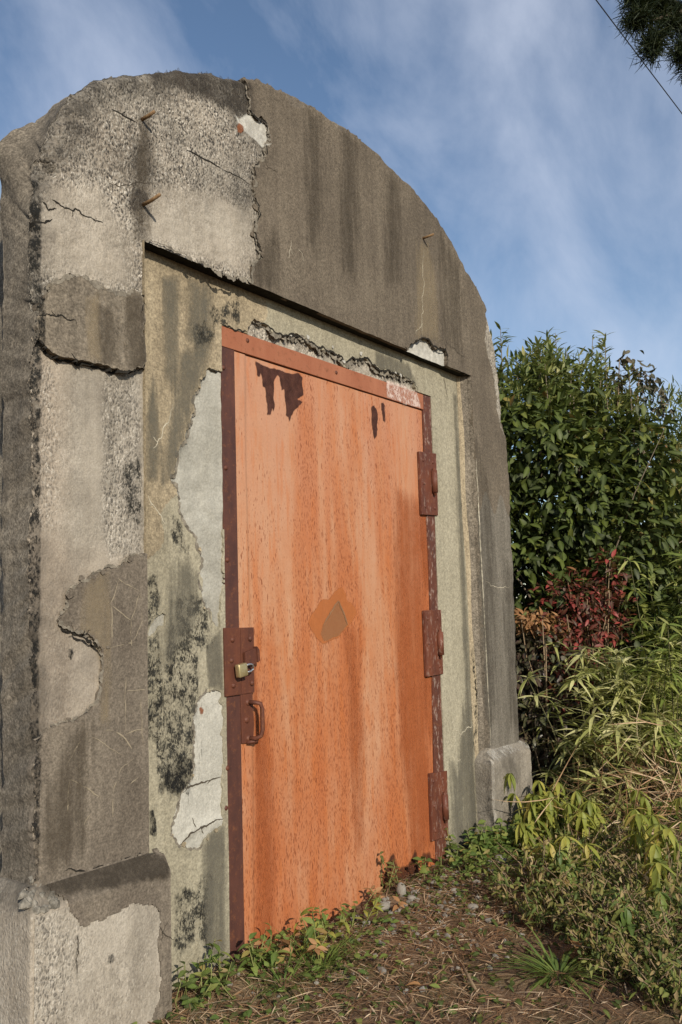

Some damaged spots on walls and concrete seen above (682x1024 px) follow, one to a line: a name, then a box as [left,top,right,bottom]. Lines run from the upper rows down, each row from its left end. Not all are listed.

crack [29,199,103,227]
spalling [27,70,271,312]
crack [187,111,276,259]
crack [34,310,141,375]
rust [256,362,303,421]
rust [371,403,385,439]
spalling [26,338,145,738]
peeling [169,369,224,627]
crack [60,628,103,656]
water stain [148,567,222,795]
peeling [169,688,223,851]
rust [381,852,431,889]